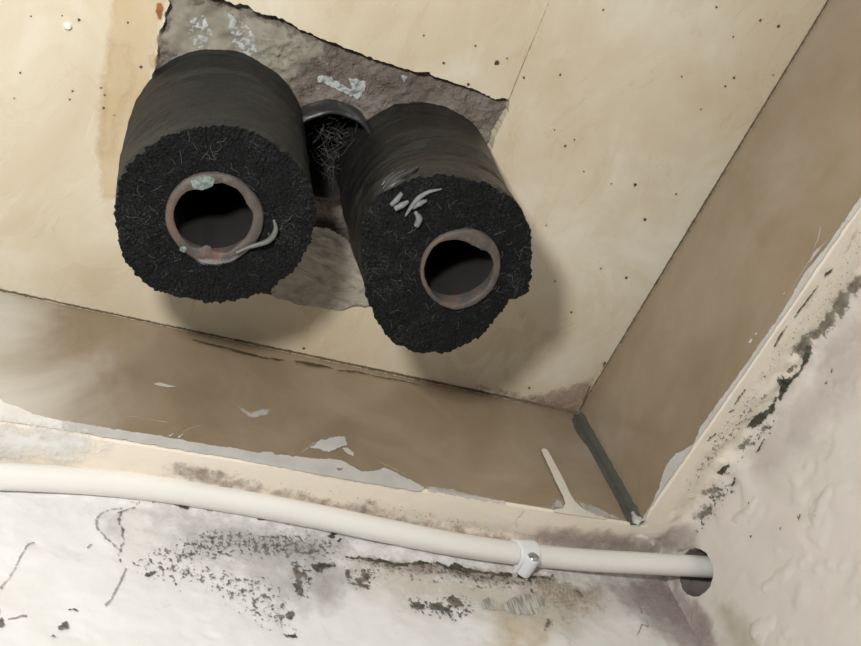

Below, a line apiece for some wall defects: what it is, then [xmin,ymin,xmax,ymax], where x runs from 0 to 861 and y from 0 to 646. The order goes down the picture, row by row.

peeling [0,393,62,429]
damp [664,268,861,551]
damp [179,463,259,492]
damp [545,531,655,552]
damp [132,530,597,638]